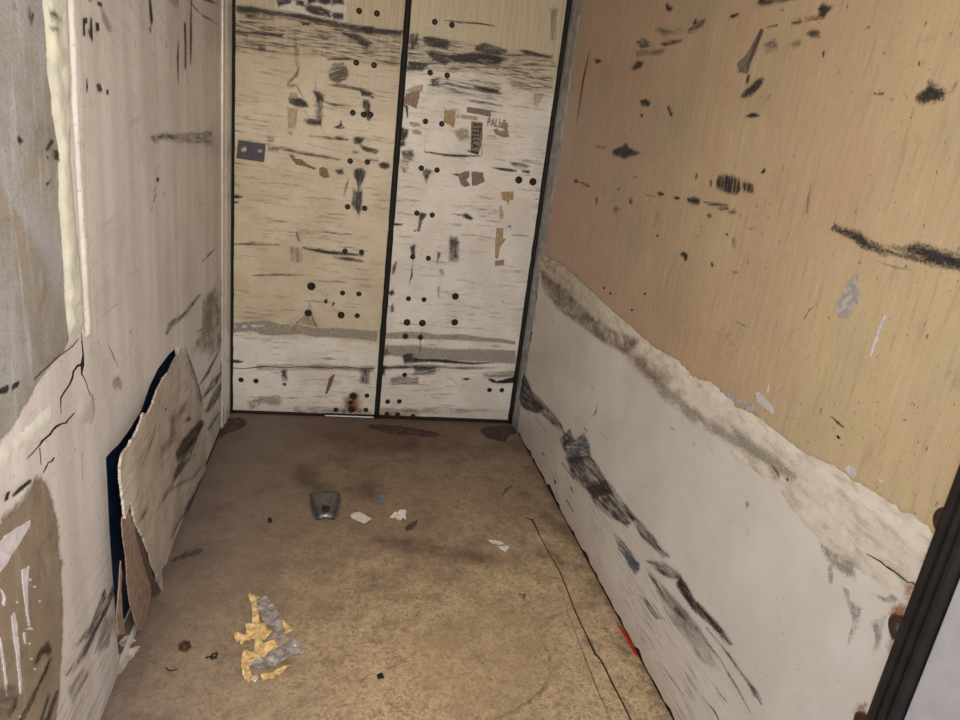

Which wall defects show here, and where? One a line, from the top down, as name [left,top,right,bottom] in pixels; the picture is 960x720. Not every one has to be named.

peeling [836,272,860,318]
crack [27,333,90,473]
water stain [535,272,796,479]
peeling [727,384,774,415]
peeling [0,479,63,720]
water stain [821,546,854,580]